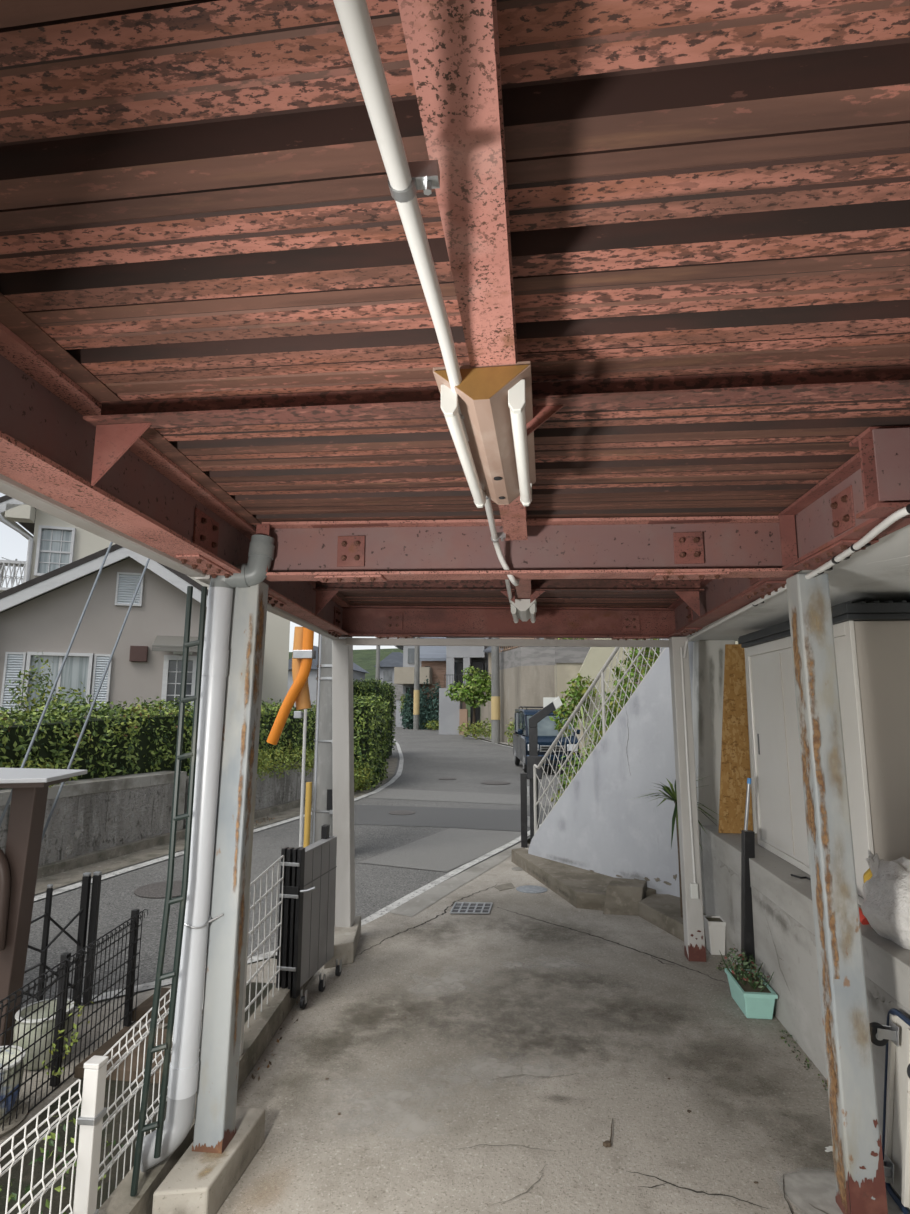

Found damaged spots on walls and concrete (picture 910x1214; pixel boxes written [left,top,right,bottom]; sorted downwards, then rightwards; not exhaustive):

corrosion [244,593,264,706]
corrosion [233,722,255,1047]
corrosion [792,600,850,1206]
corrosion [192,1126,236,1176]
crack [628,1171,828,1214]